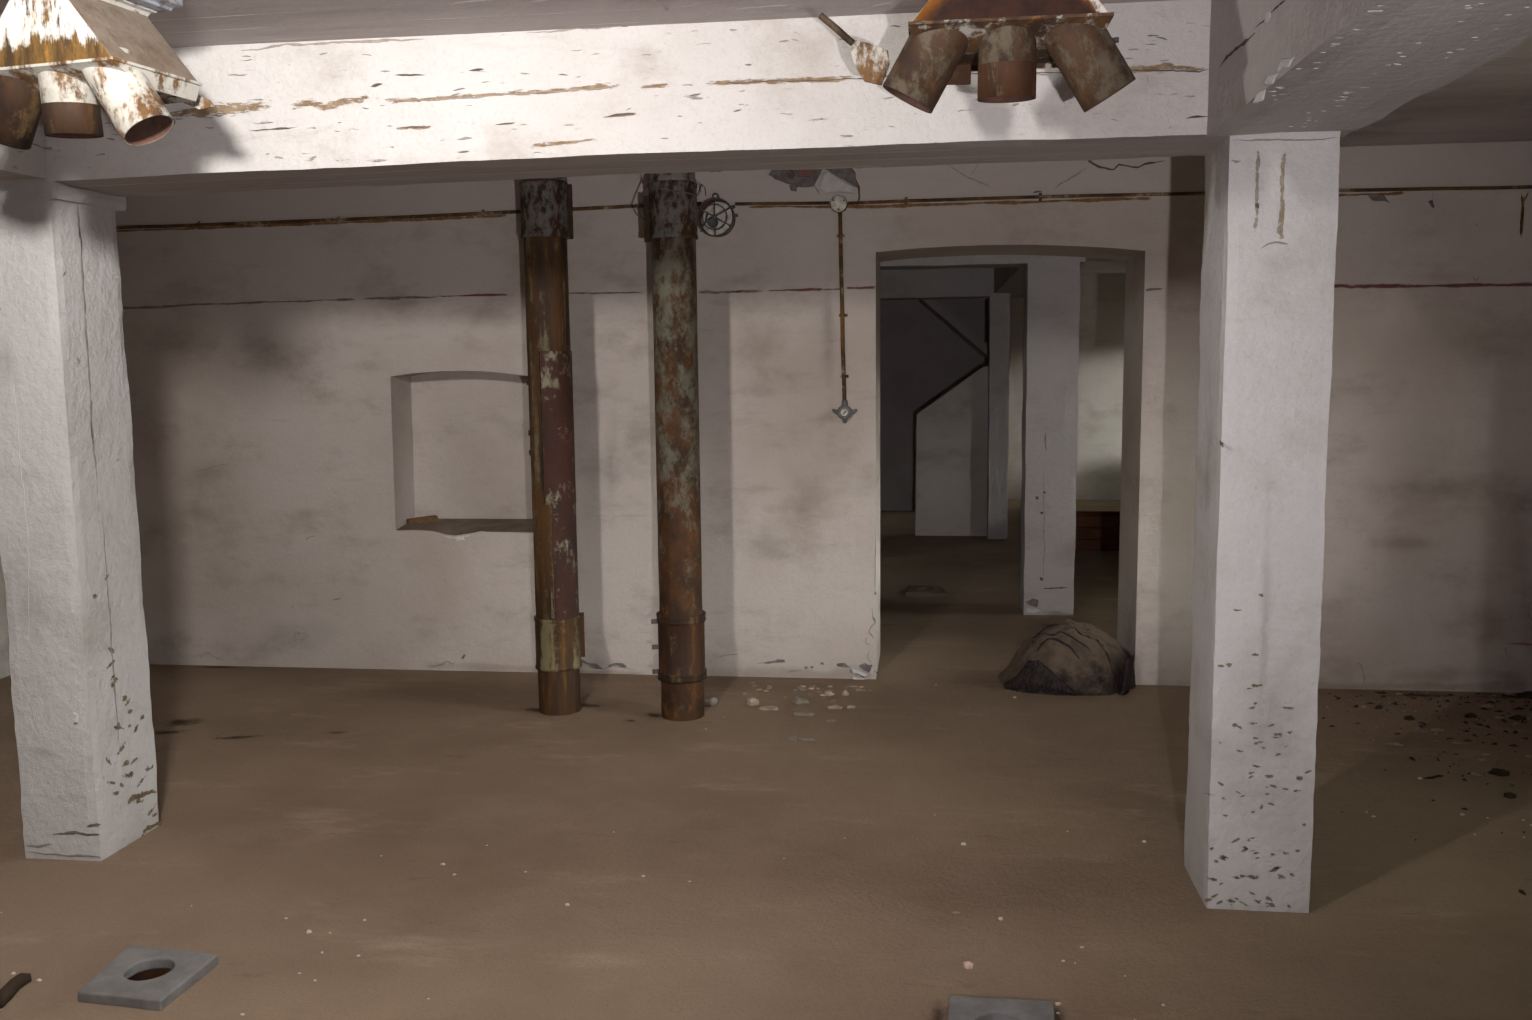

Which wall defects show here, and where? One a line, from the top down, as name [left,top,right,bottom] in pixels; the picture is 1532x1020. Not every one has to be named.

rust [389,83,618,103]
rust [706,76,863,85]
rust [1129,62,1209,82]
rust [170,102,269,118]
rust [250,96,368,131]
rust [534,139,592,147]
crack [1033,160,1165,193]
crack [1216,137,1337,251]
spalling [106,647,162,837]
spalling [1205,684,1311,817]
spalling [1205,837,1300,908]